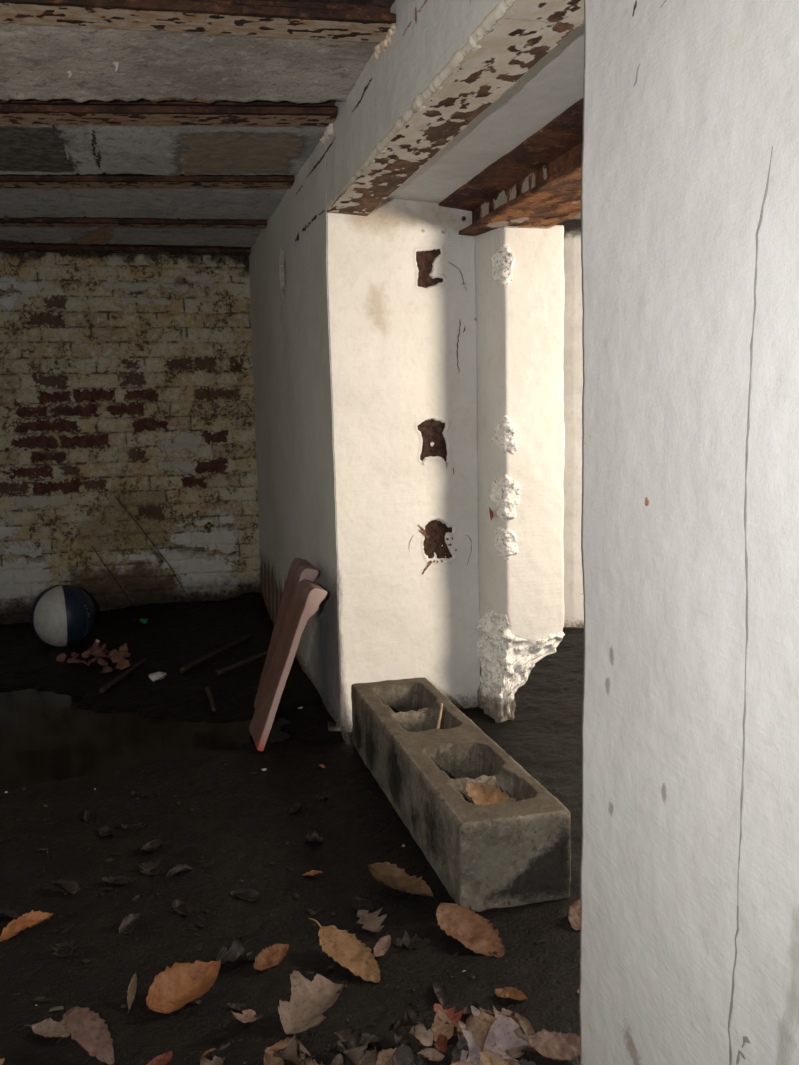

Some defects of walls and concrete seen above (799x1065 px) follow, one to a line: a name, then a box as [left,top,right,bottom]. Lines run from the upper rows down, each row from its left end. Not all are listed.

water stain [0,126,81,173]
rust [484,168,581,229]
flaking render [0,275,68,329]
peeling [100,273,224,307]
flaking render [164,355,247,404]
flaking render [0,357,170,509]
flaking render [201,429,228,444]
flaking render [181,457,229,488]
peeling [0,519,54,608]
peeling [101,502,244,594]
crack [728,146,773,1065]